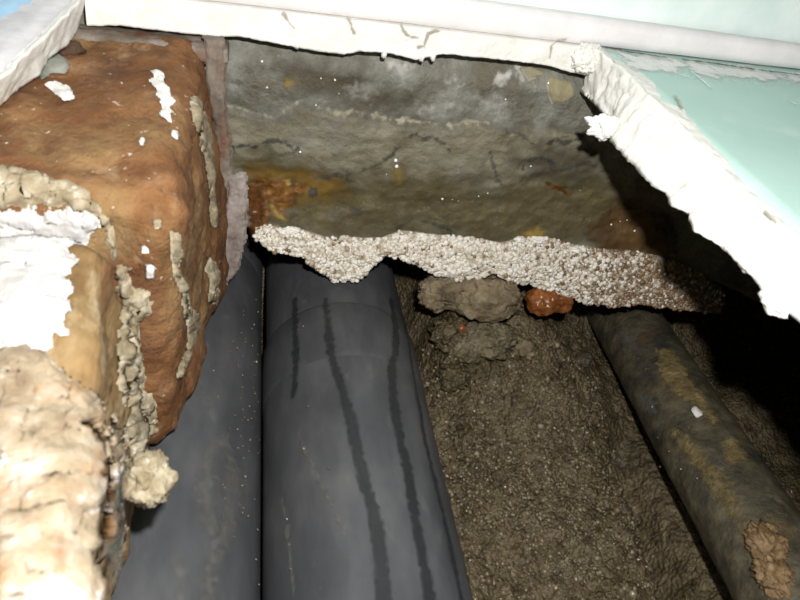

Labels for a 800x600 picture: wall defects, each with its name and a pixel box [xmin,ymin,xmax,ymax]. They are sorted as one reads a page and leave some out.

crack [231,138,300,151]
spalling [0,0,800,323]
crack [384,134,444,161]
crack [522,130,590,172]
corrosion [247,169,342,243]